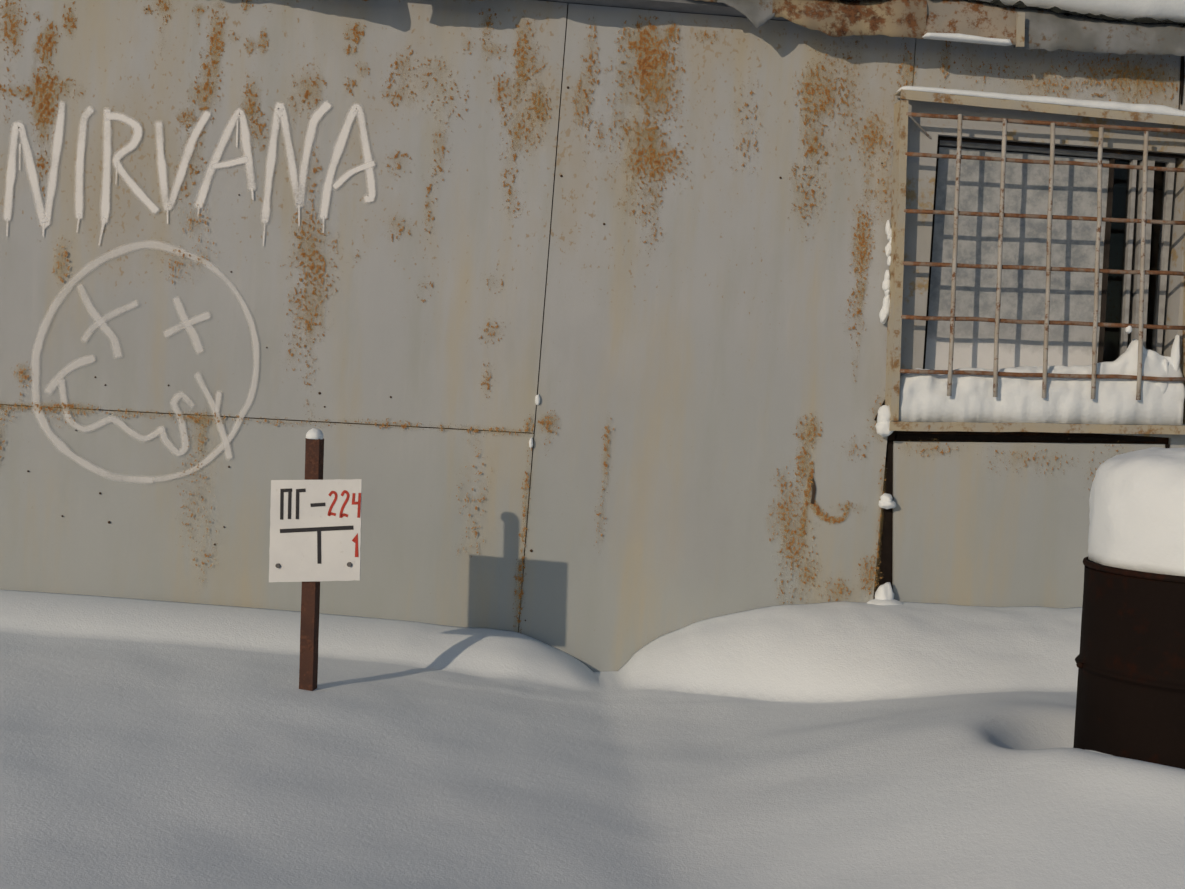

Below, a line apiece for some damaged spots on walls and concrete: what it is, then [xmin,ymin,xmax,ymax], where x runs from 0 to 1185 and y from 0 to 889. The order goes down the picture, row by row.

rust [0,0,83,197]
rust [160,6,268,284]
rust [287,64,327,123]
rust [280,146,338,385]
rust [344,23,370,96]
rust [382,45,469,242]
rust [463,9,551,220]
rust [572,9,692,254]
rust [789,41,893,346]
rust [939,41,1185,104]
rust [768,413,886,604]